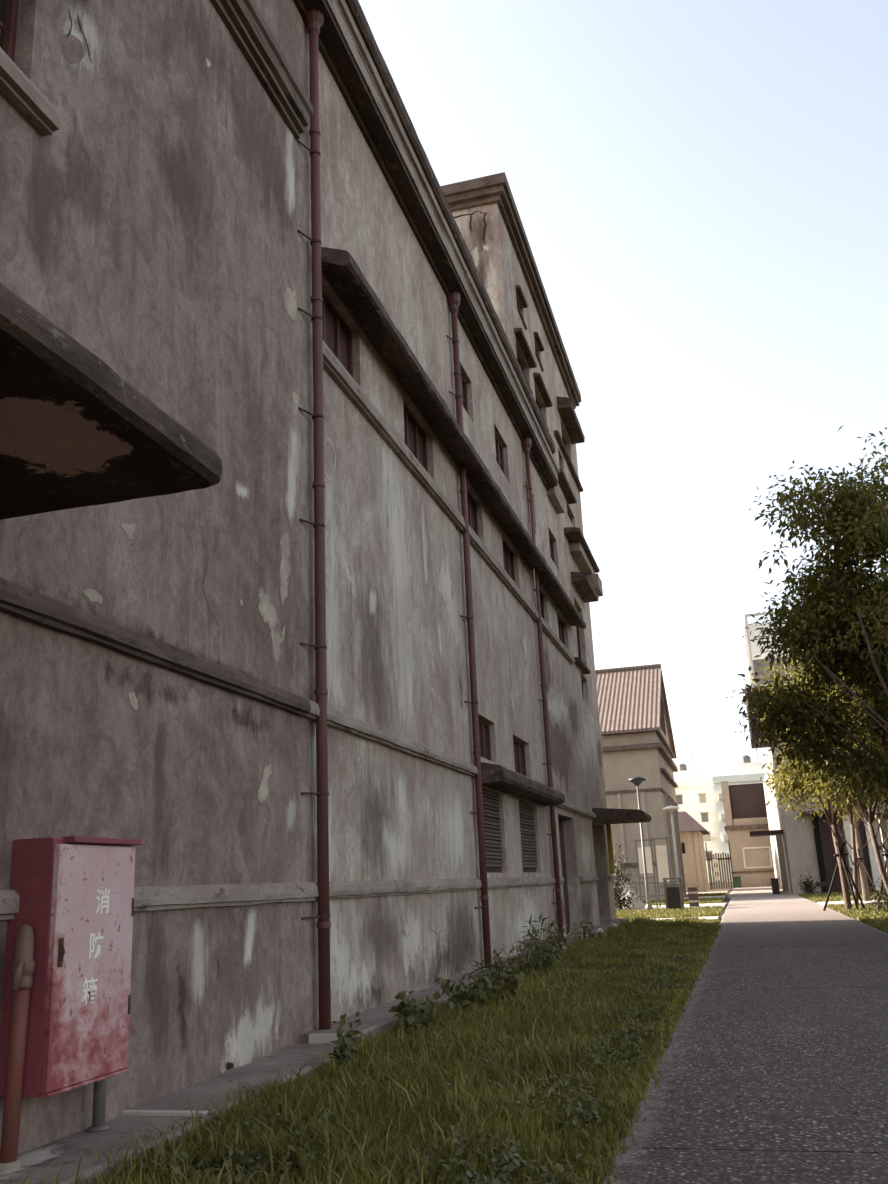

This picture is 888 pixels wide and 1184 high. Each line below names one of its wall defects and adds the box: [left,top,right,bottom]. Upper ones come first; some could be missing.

peeling [286,130,295,213]
crack [454,210,487,284]
peeling [0,397,134,477]
peeling [236,483,247,499]
peeling [258,391,300,663]
leakage [324,438,356,710]
leakage [362,439,465,732]
leakage [244,911,255,967]
leakage [329,899,381,1014]
leakage [395,906,470,984]